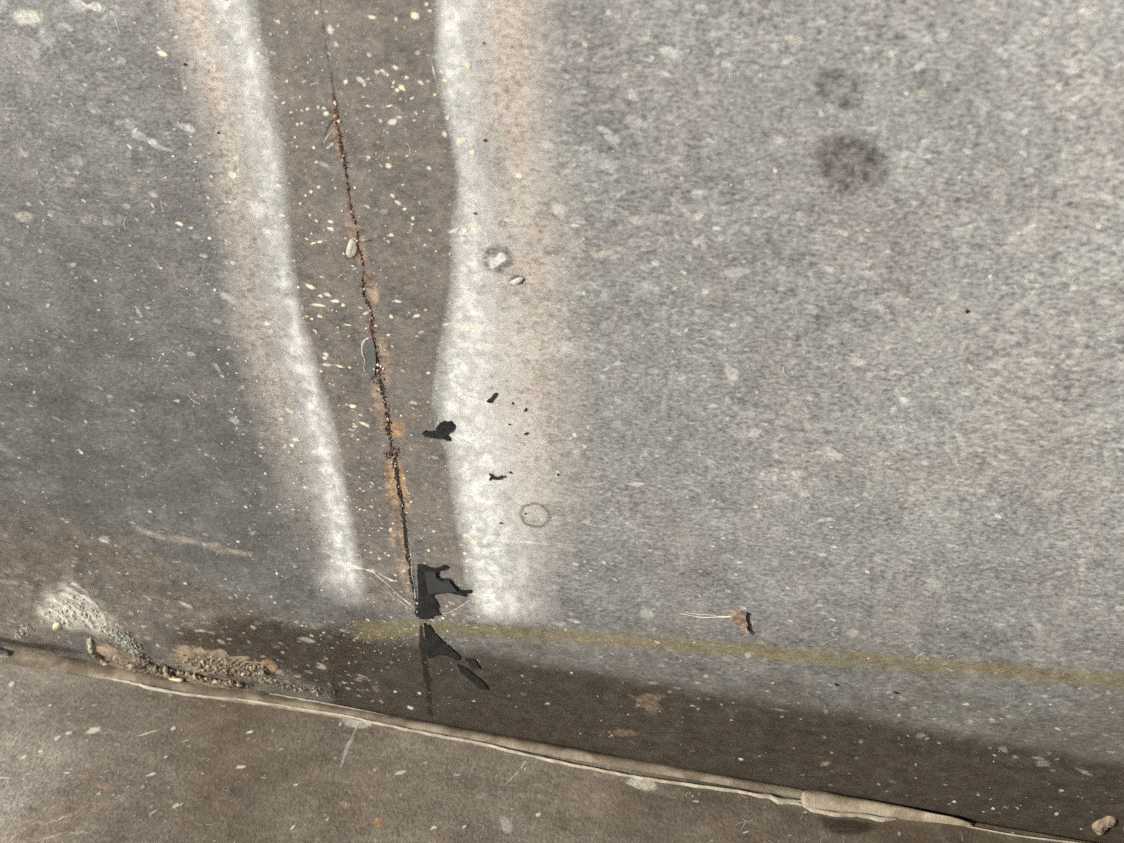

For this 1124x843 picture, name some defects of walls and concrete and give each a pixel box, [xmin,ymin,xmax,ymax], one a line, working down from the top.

crack [324,79,432,716]